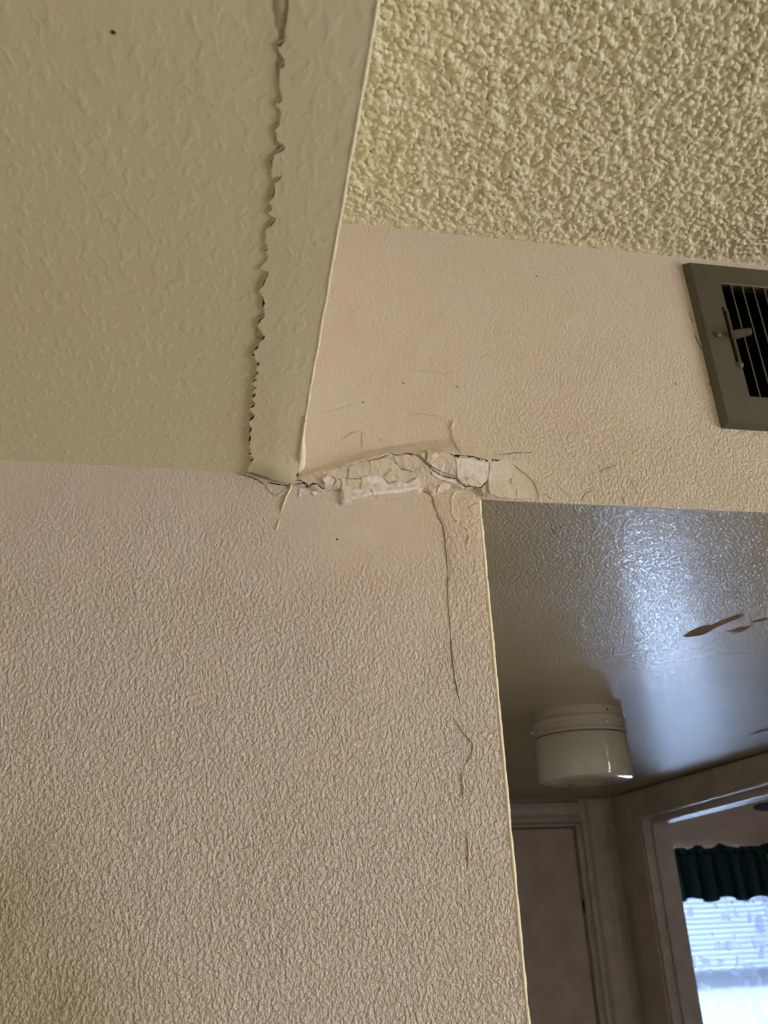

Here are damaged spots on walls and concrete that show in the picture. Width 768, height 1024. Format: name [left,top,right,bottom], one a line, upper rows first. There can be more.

crack [247,0,533,798]
flaking render [296,415,539,545]
peeling [683,614,768,637]
crack [463,833,471,866]